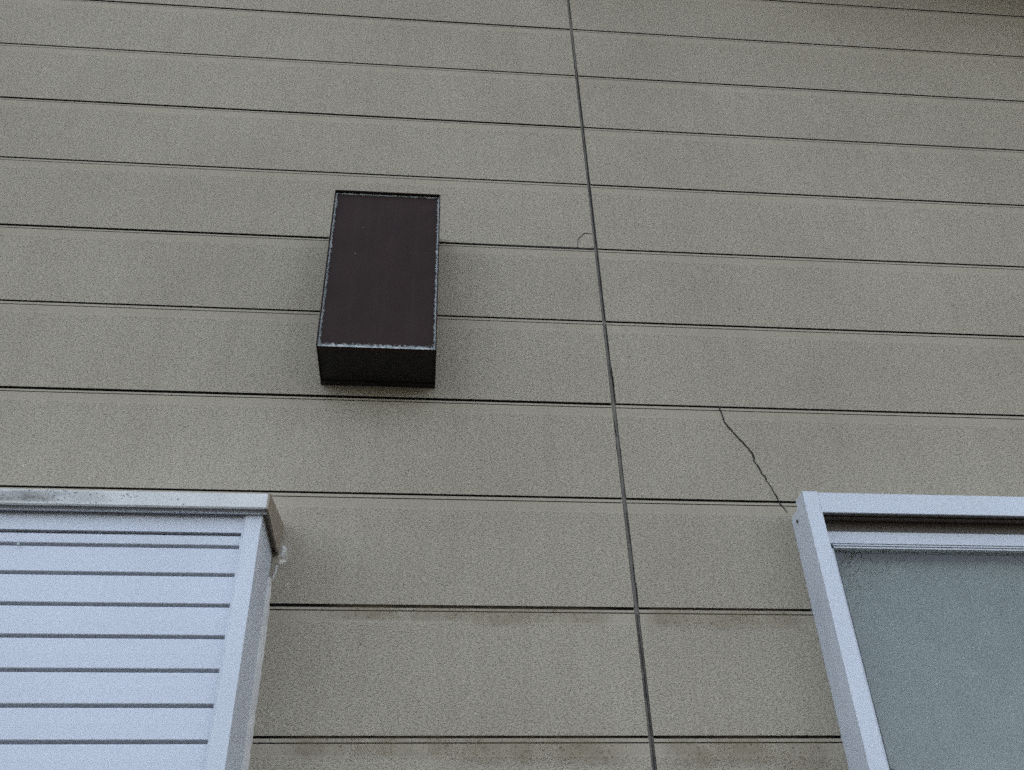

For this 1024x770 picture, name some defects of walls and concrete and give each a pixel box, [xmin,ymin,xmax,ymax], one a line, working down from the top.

crack [719,406,787,512]